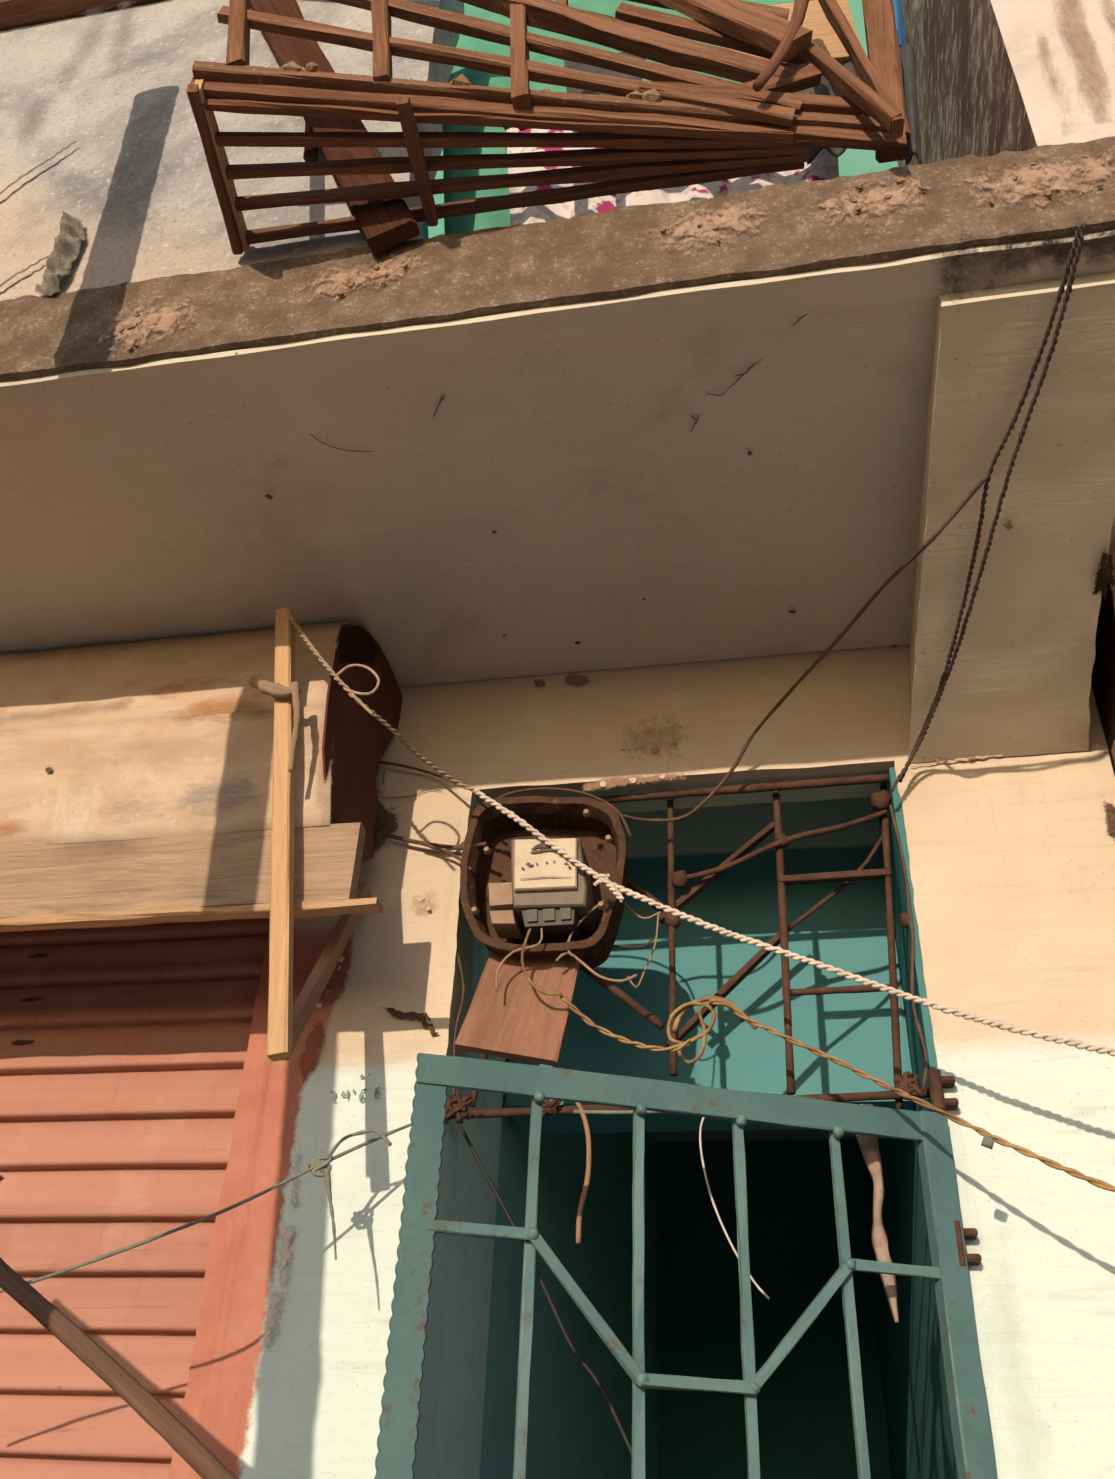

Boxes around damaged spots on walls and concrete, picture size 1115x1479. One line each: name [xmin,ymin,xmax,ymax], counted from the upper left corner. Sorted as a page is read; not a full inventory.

spalling [965,153,1115,207]
damp [934,229,1115,299]
spalling [98,296,197,351]
crack [383,1007,439,1035]